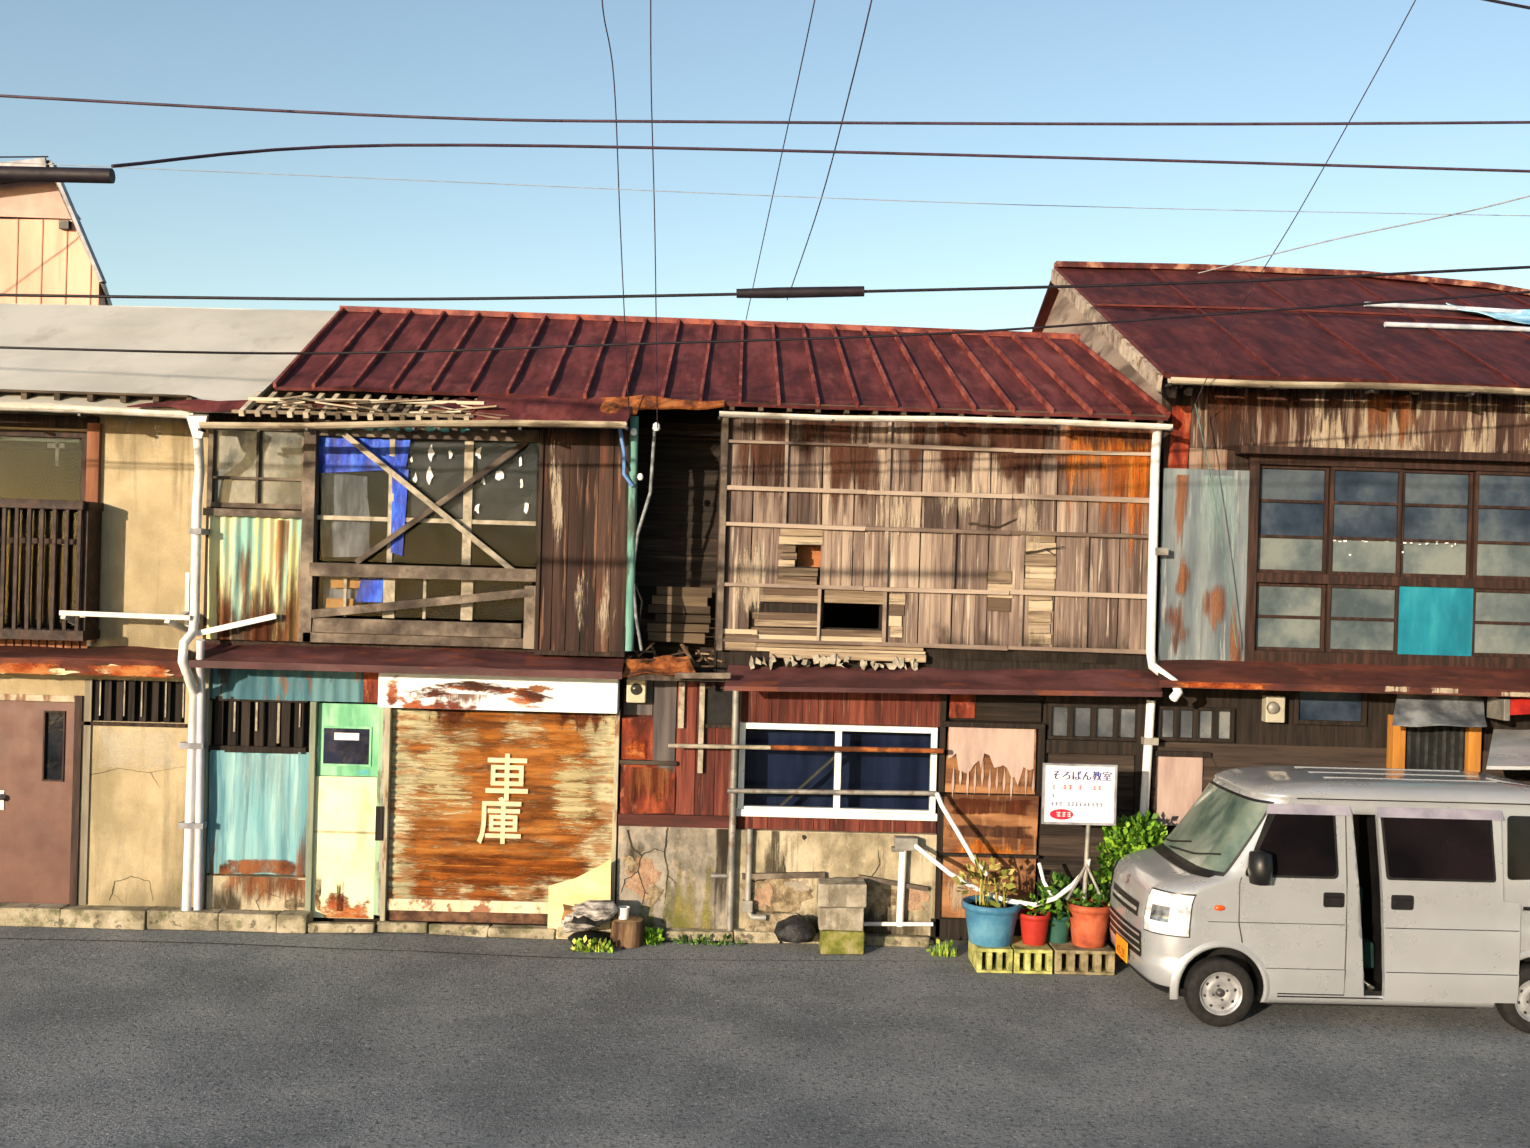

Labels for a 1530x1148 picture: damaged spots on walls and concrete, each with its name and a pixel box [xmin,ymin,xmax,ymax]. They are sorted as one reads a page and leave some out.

leakage [1207,386,1299,443]
leakage [736,411,879,521]
leakage [901,415,1067,499]
rust [1063,422,1151,554]
rust [1175,475,1188,541]
rust [217,520,300,642]
rust [1165,560,1190,653]
rust [1204,587,1241,661]
rust [0,663,57,675]
rust [88,665,170,678]
rust [386,676,609,901]
rust [209,828,306,910]